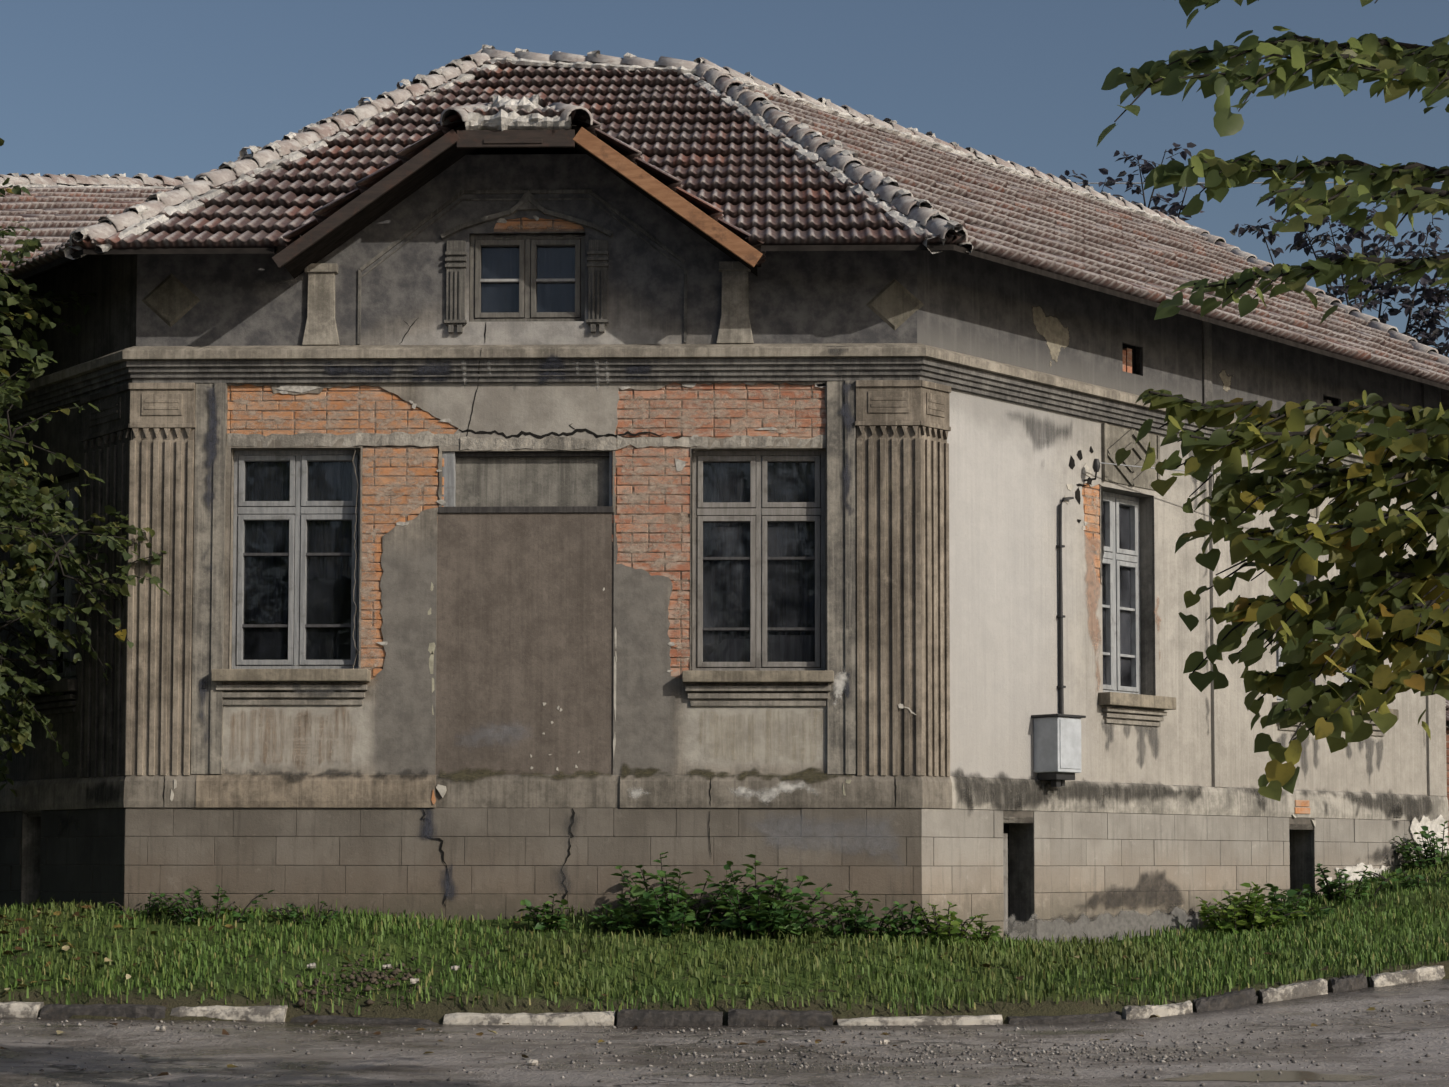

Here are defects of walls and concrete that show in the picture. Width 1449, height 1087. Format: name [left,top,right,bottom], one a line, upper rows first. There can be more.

spalling [494,216,585,232]
peeling [1032,306,1069,366]
crack [459,323,663,439]
spalling [227,384,459,679]
spalling [612,382,827,678]
peeling [428,642,436,715]
leakage [954,771,1201,810]
leakage [1105,723,1157,767]
leakage [1347,741,1383,775]
leakage [1326,792,1432,825]
crack [421,809,449,907]
crack [561,808,575,899]